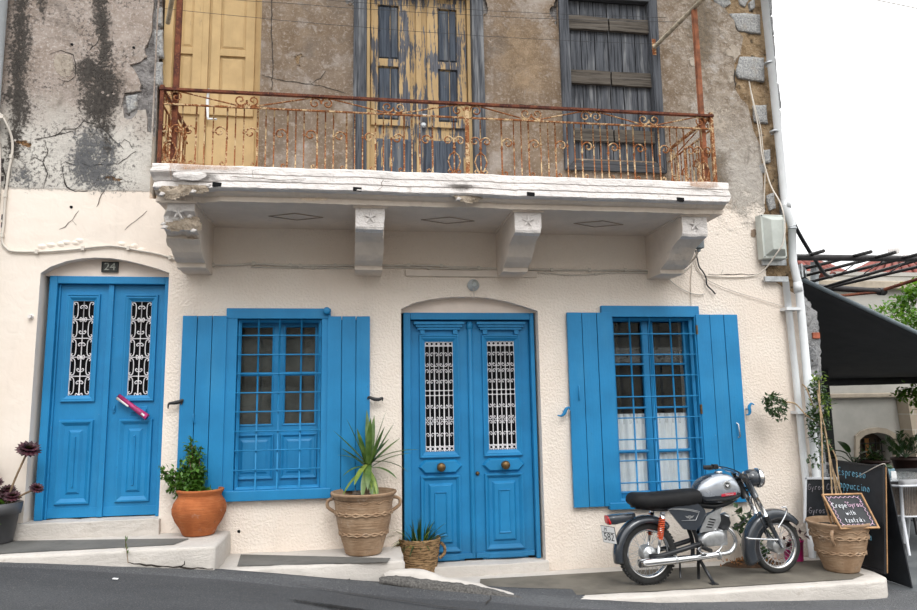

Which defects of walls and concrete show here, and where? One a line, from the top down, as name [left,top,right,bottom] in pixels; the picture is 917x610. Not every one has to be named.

damp [1,0,50,189]
damp [63,0,126,195]
flaking render [692,0,794,293]